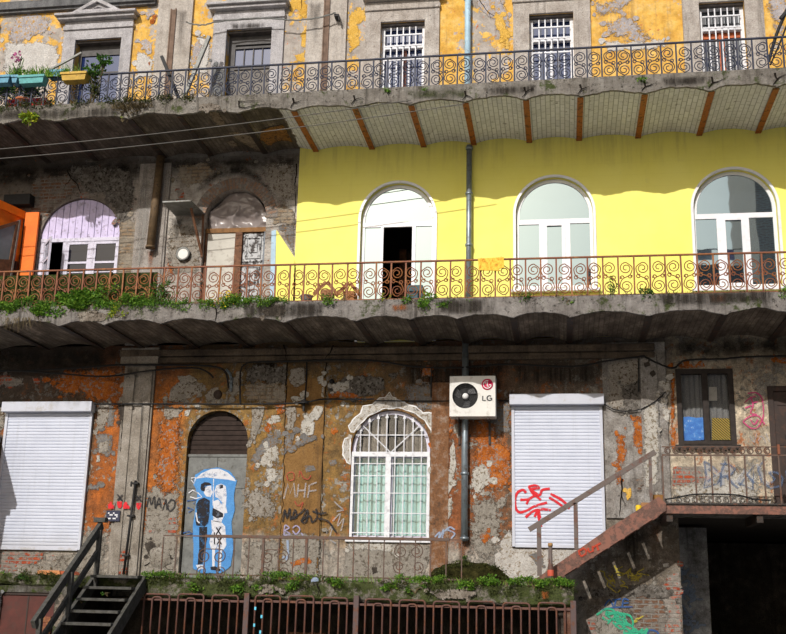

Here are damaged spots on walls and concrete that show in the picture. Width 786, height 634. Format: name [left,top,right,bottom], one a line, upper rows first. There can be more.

peeling [0,13,63,85]
peeling [346,37,360,52]
spalling [477,0,513,43]
peeling [591,0,670,52]
peeling [0,368,134,462]
spalling [140,363,440,582]
peeling [448,394,457,519]
spalling [466,401,577,580]
peeling [600,341,676,495]
peeling [243,528,328,595]